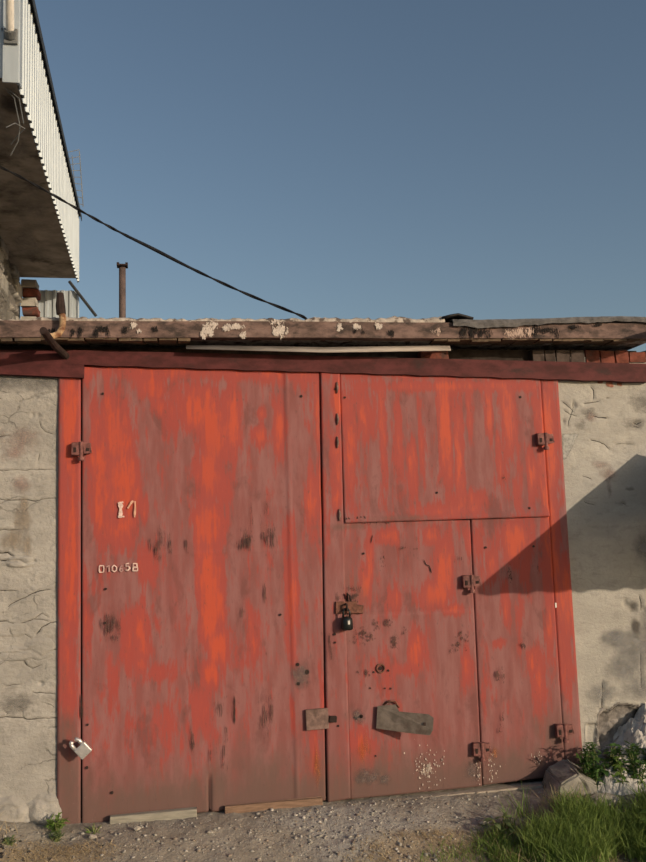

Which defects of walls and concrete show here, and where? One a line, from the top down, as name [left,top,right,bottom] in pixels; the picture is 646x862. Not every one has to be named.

peeling [200,320,246,339]
peeling [270,319,288,340]
peeling [504,327,535,338]
crack [563,389,606,426]
crack [0,589,57,638]